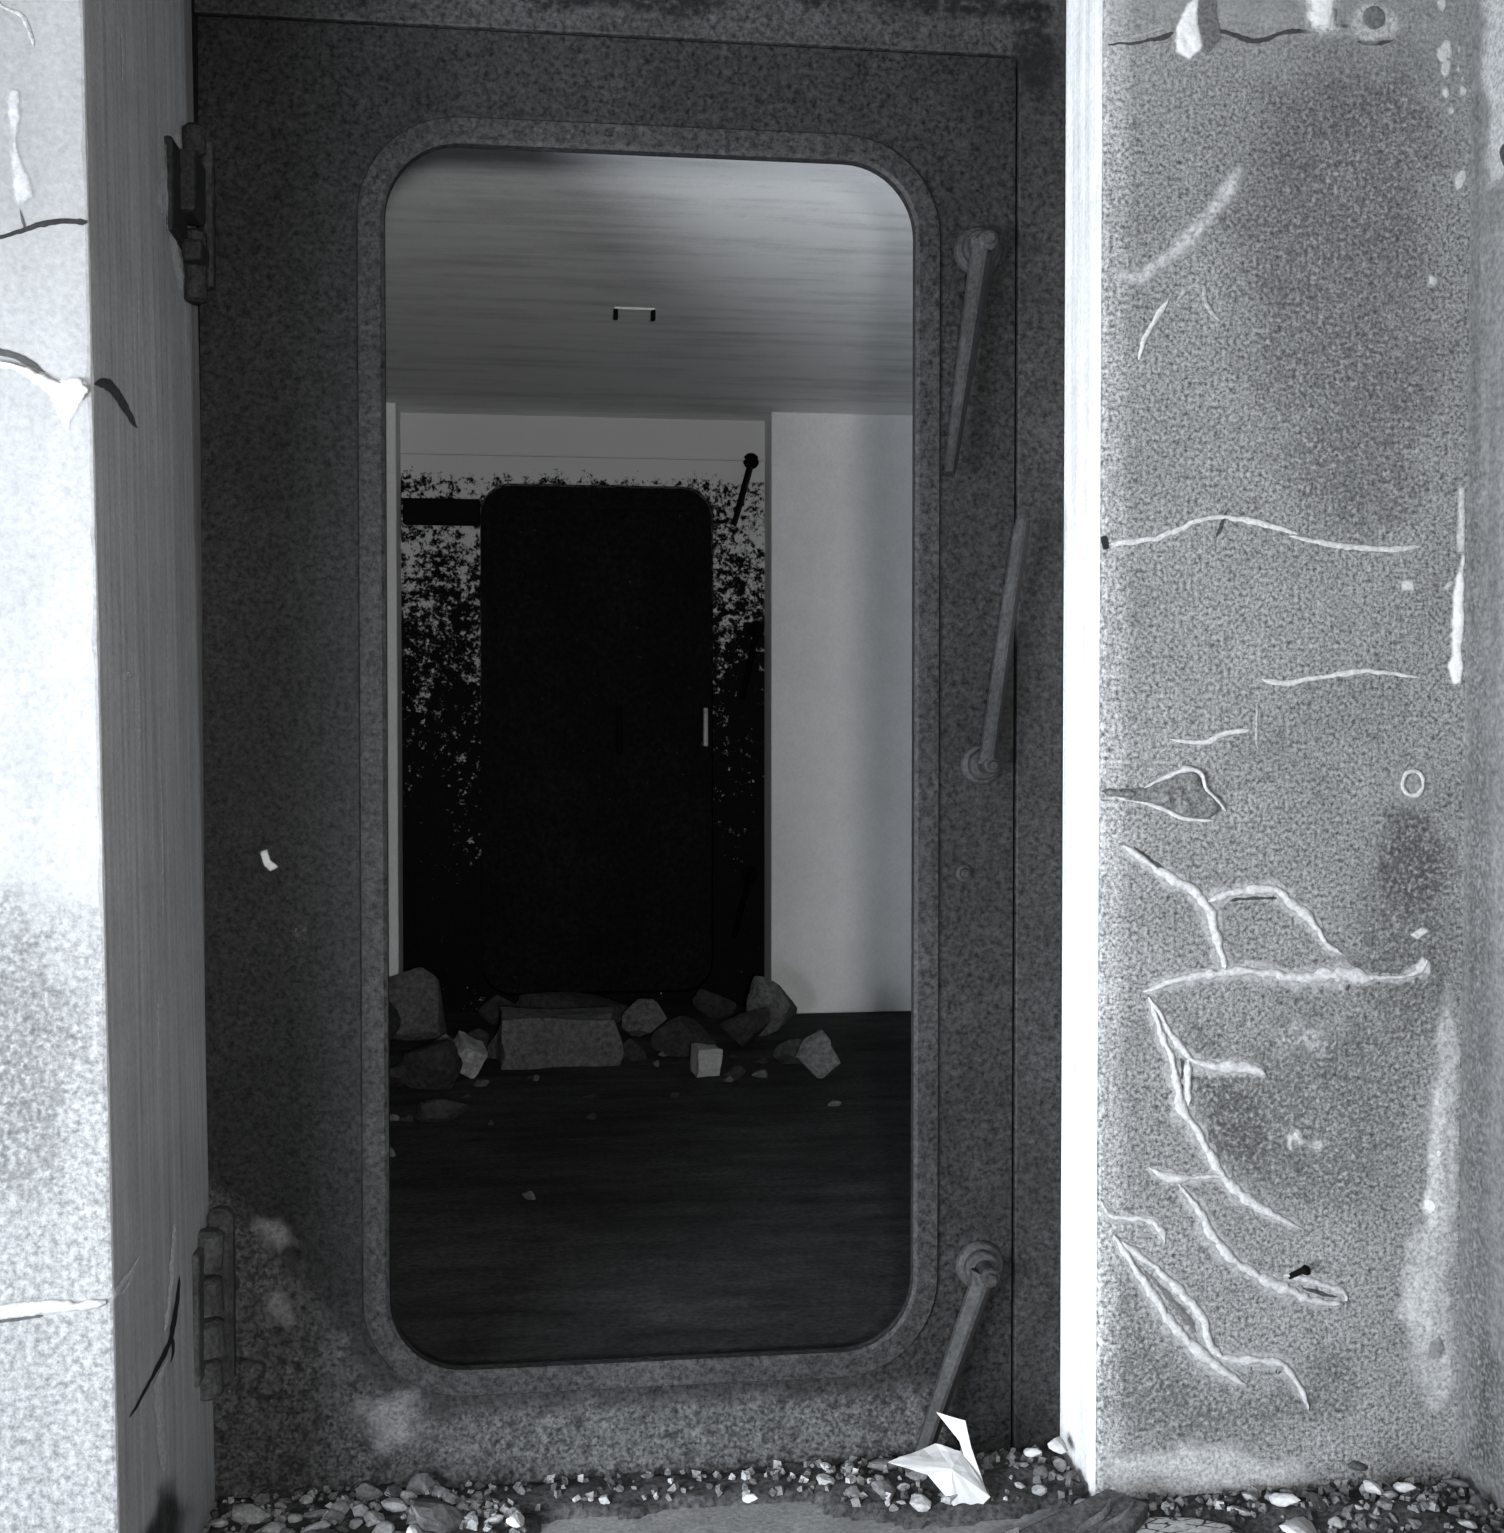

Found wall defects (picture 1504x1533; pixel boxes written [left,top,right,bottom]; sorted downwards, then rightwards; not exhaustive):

crack [0,3,34,47]
crack [0,89,88,239]
crack [0,348,138,428]
crack [1101,508,1421,553]
crack [1169,669,1420,749]
crack [1099,844,1431,1411]
crack [0,1223,181,1471]